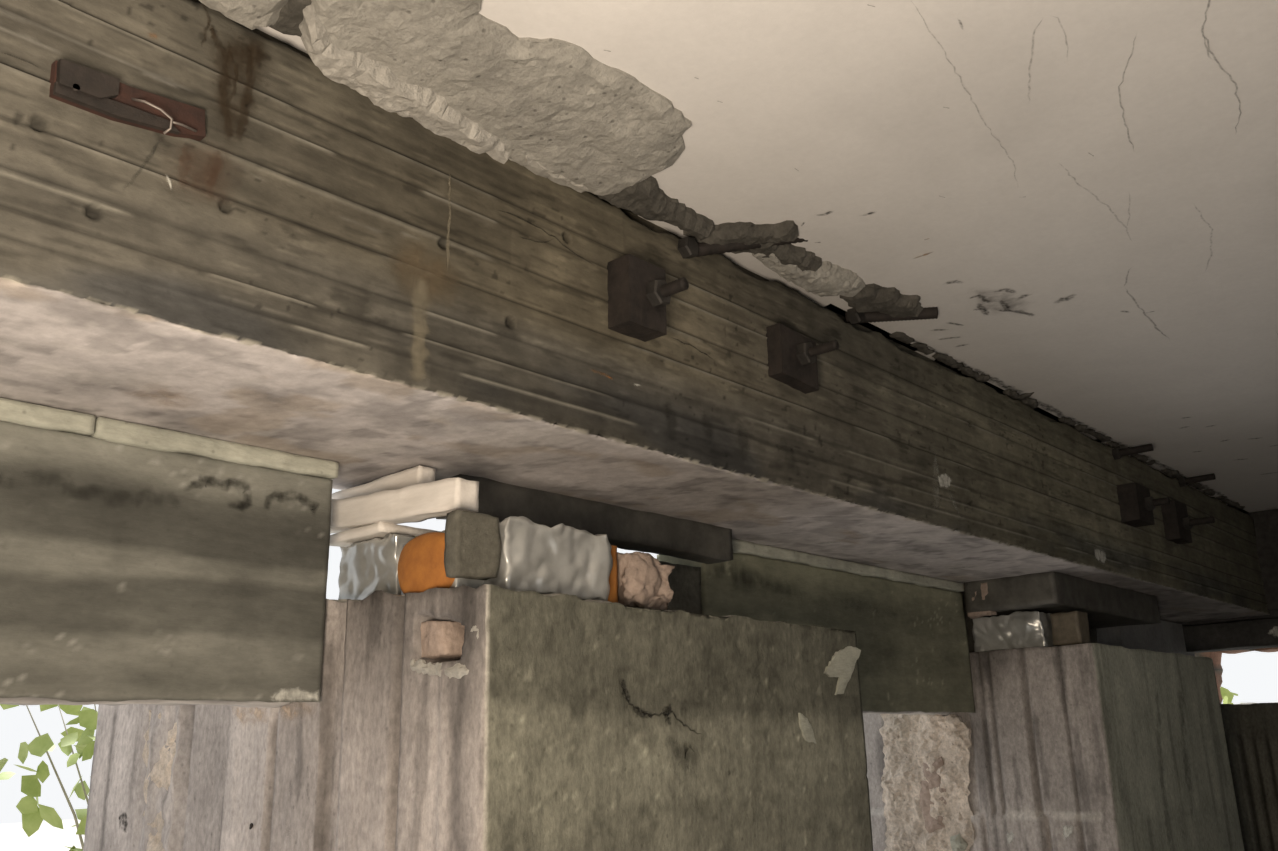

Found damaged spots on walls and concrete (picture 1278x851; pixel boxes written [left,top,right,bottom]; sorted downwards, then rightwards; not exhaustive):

spalling [199,0,990,383]